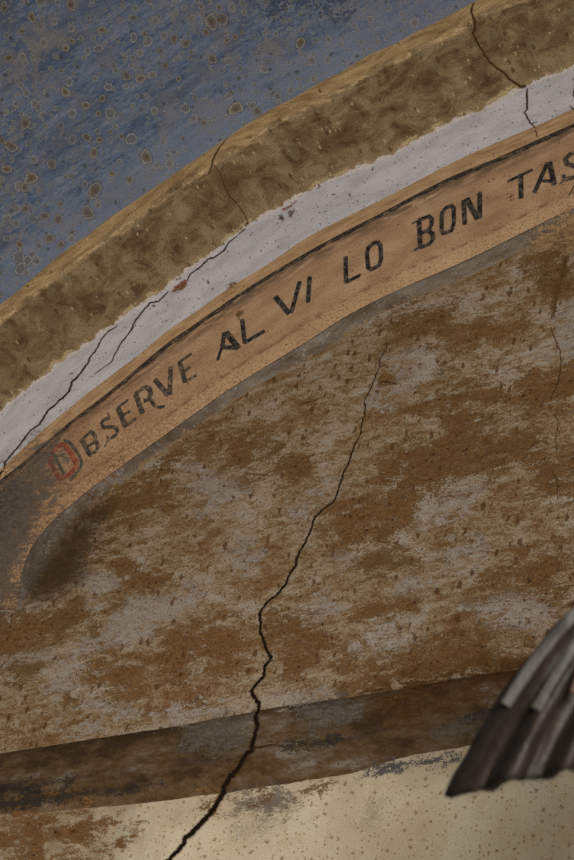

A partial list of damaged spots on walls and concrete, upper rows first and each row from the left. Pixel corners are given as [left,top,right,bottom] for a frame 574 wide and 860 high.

water stain [57,83,152,165]
crack [470,3,538,138]
water stain [0,165,102,275]
crack [187,138,248,281]
flaking render [527,205,574,261]
crack [0,293,167,474]
crack [166,339,395,860]